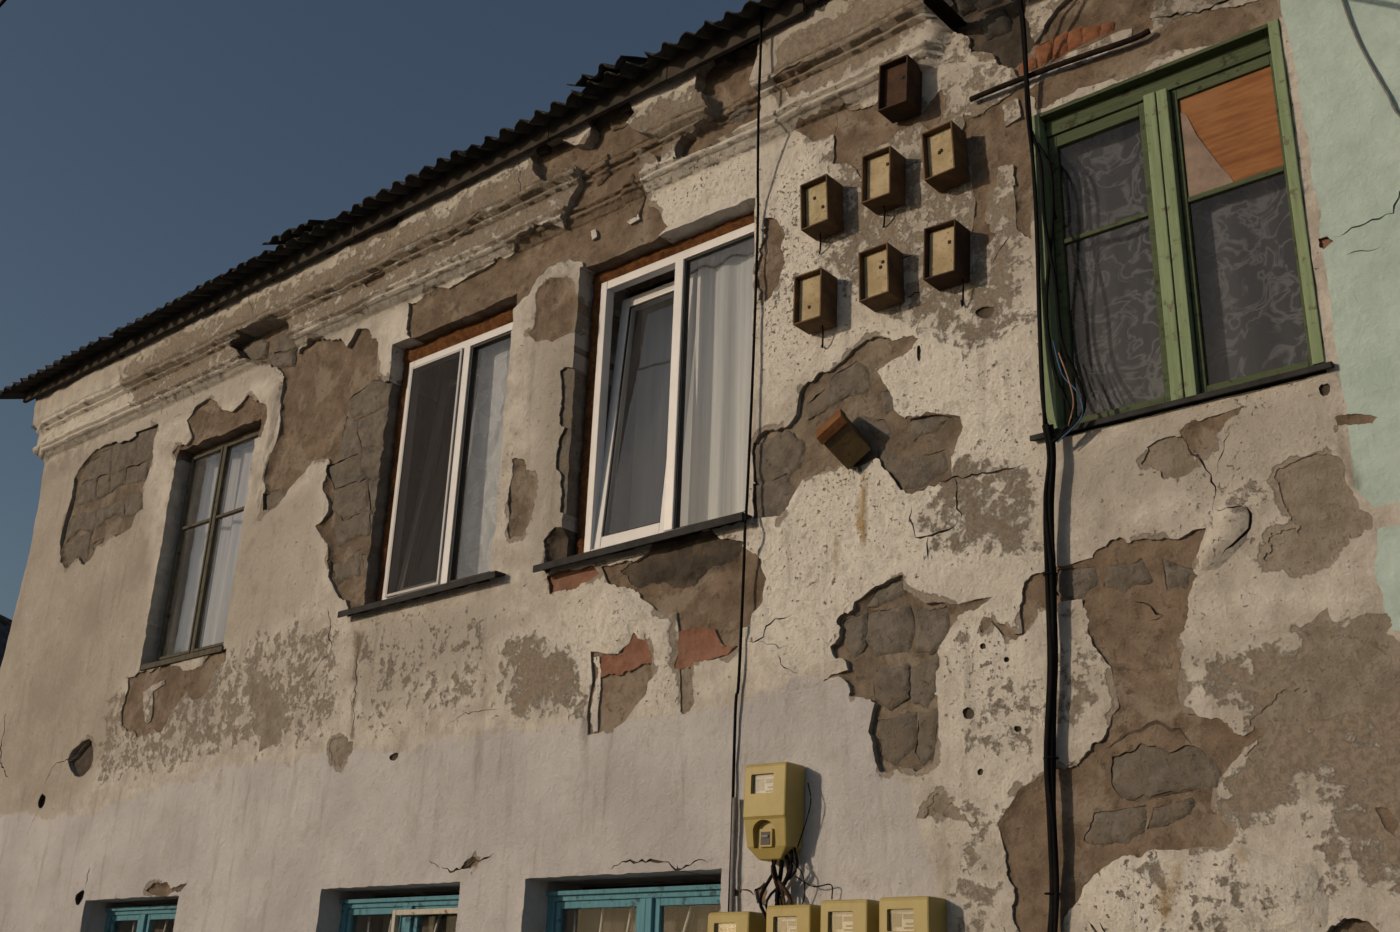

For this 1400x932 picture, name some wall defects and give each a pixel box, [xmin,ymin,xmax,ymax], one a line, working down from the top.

crack [1155,0,1229,18]
flaking render [754,217,785,301]
flaking render [60,424,158,568]
flaking render [173,317,401,617]
flaking render [406,41,766,714]
flaking render [752,335,963,519]
flaking render [1141,406,1242,479]
crack [1178,426,1252,556]
flaking render [121,648,227,737]
flaking render [587,633,653,735]
flaking render [824,528,1400,932]
crack [609,859,760,895]